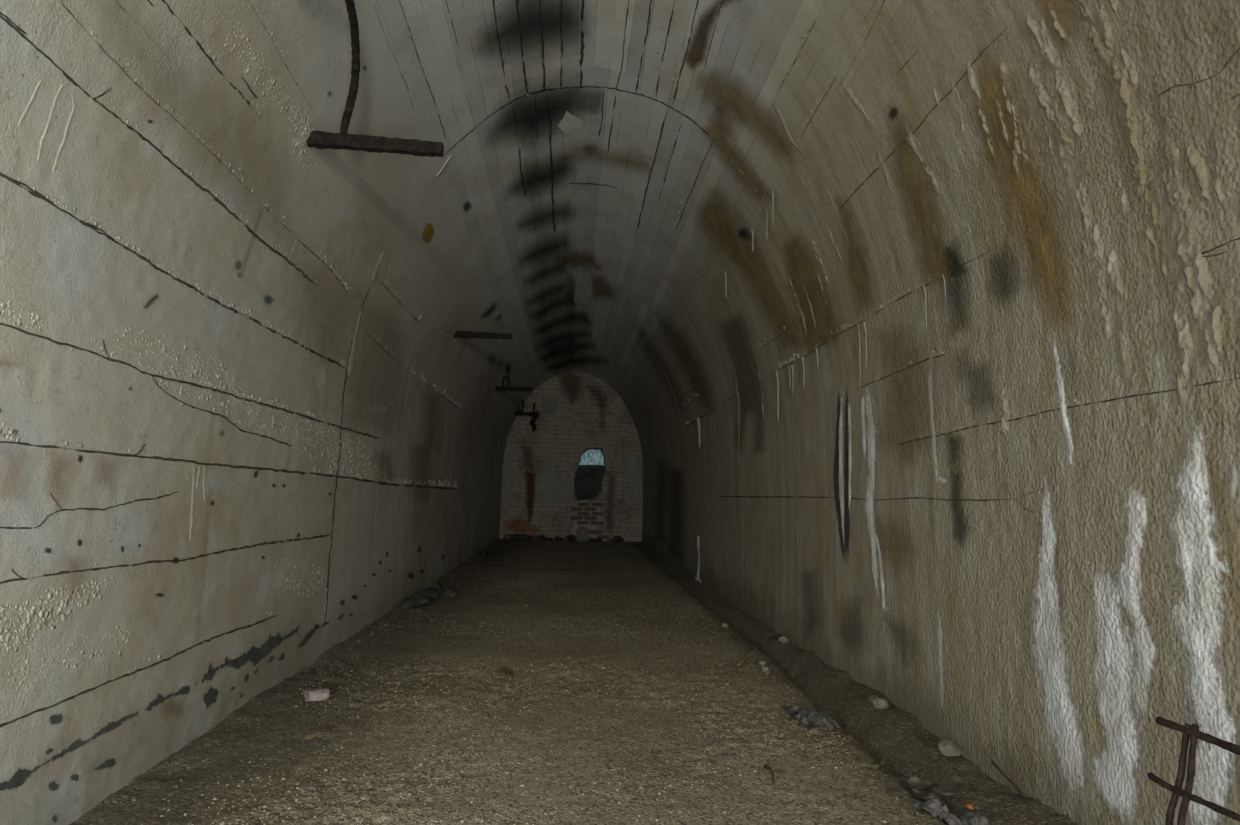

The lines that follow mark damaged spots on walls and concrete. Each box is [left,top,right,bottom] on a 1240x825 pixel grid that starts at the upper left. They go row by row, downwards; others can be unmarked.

crack [0,0,318,286]
crack [0,173,346,368]
crack [492,0,699,232]
corrosion [980,69,1064,315]
crack [0,323,458,529]
corrosion [527,472,535,520]
damp [833,388,885,610]
damp [928,371,966,541]
damp [1052,341,1074,464]
crack [0,612,277,727]
damp [1031,477,1156,824]
damp [1170,421,1237,825]